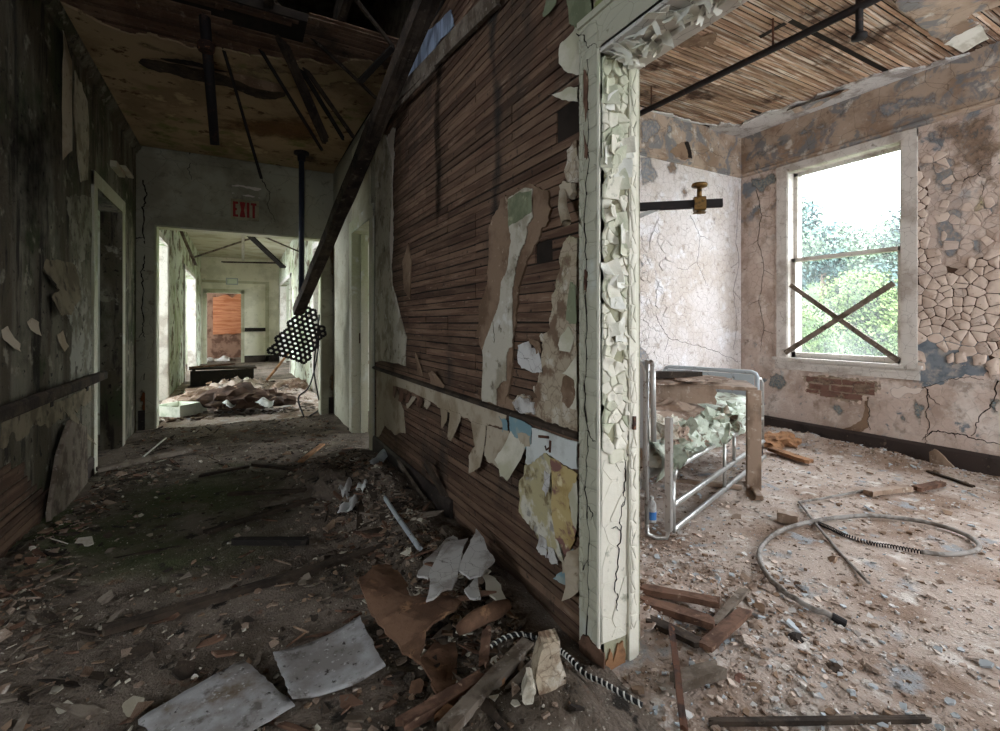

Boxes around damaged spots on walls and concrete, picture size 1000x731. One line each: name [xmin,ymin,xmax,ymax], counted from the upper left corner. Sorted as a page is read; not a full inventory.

flaking render [0,194,96,449]
crack [136,180,148,337]
peeling [375,0,1000,629]
crack [655,191,772,362]
crack [922,376,1000,445]